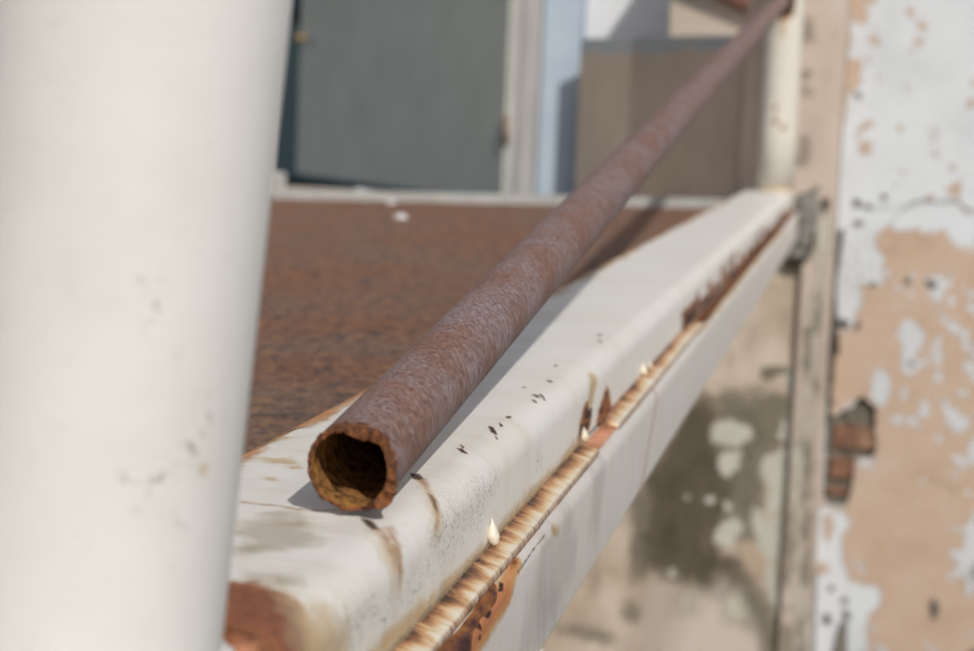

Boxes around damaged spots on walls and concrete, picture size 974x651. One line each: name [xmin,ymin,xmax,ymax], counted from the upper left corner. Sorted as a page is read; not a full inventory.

peeling [843,0,882,124]
rust [578,375,612,442]
peeling [704,186,974,651]
water stain [631,390,803,651]
rust [224,580,313,651]
rust [471,558,522,651]
water stain [823,599,850,625]